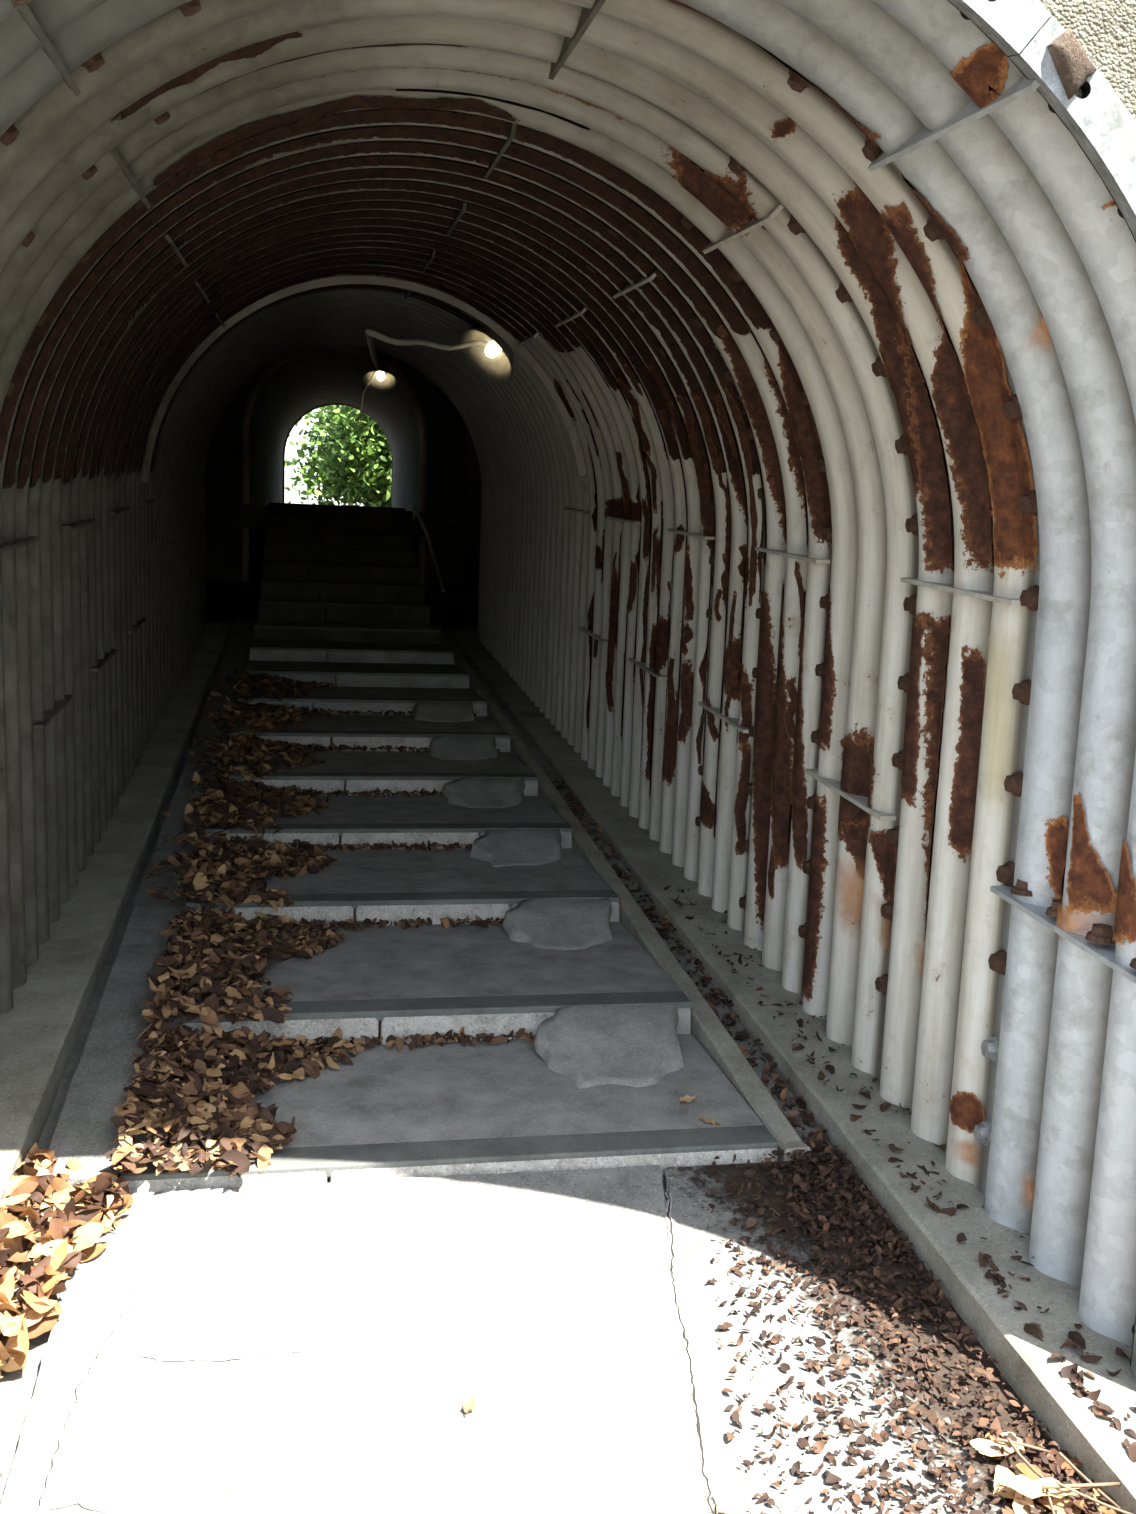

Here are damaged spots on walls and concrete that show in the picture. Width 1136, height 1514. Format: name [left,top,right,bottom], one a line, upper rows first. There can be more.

corrosion [110,31,467,122]
corrosion [401,67,623,120]
corrosion [948,42,1009,108]
corrosion [833,174,1040,579]
corrosion [0,89,897,1002]
corrosion [900,612,987,960]
corrosion [1044,792,1136,945]
corrosion [949,1088,986,1163]
crack [48,1500,105,1514]